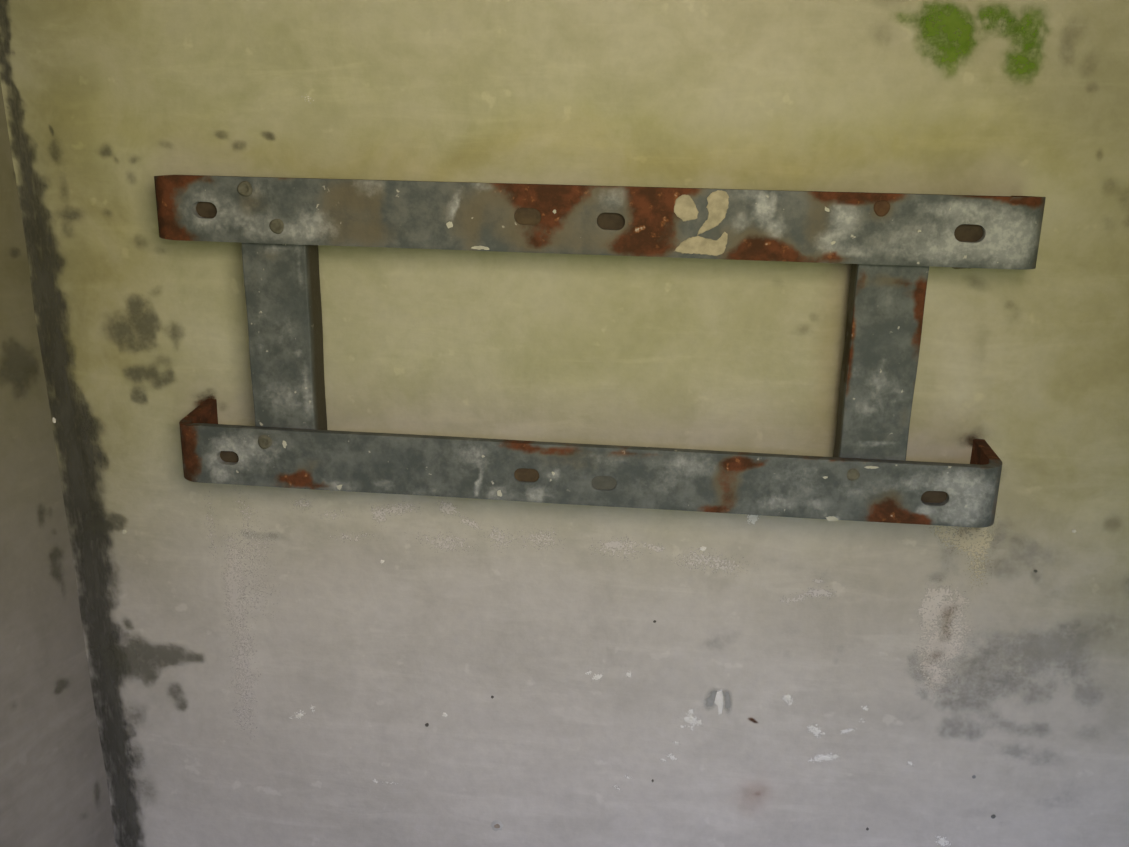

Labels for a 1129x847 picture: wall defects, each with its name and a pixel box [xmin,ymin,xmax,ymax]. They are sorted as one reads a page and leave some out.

water stain [0,0,202,847]
water stain [914,511,999,702]
flaking render [661,689,730,762]